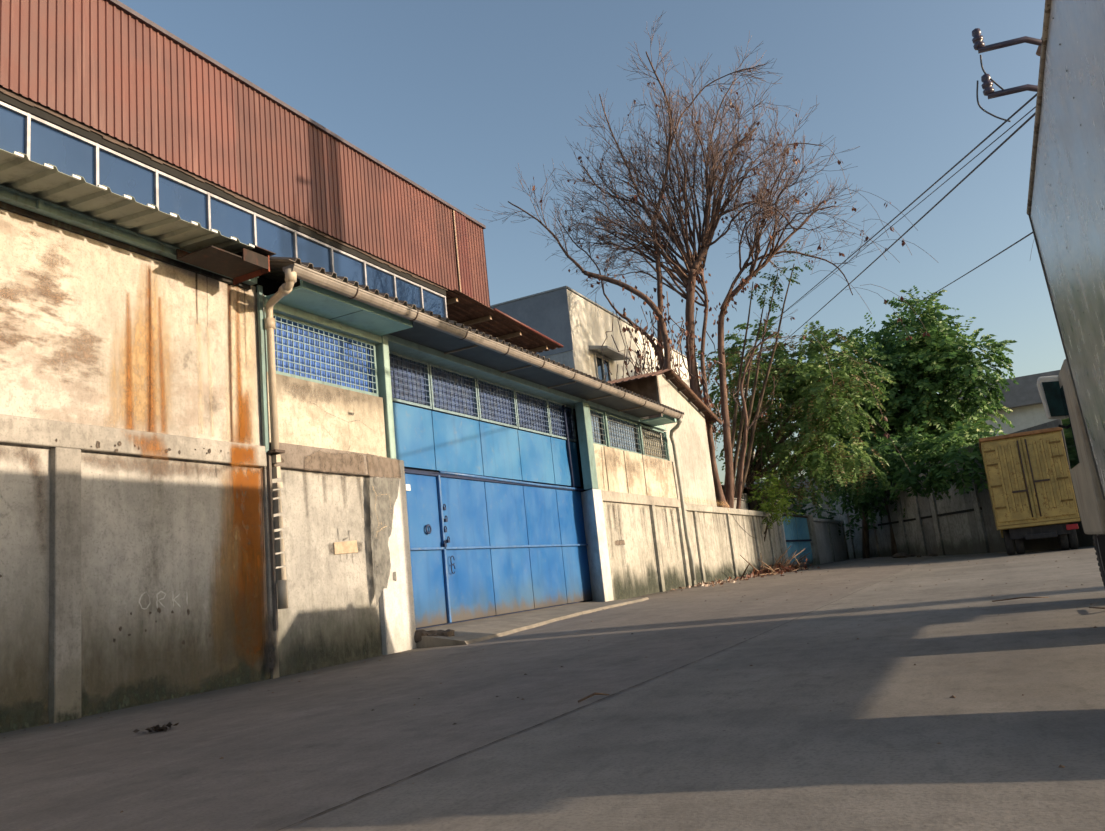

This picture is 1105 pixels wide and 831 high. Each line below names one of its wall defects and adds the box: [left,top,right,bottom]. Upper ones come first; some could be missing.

corrosion [114,273,167,474]
corrosion [217,284,265,663]